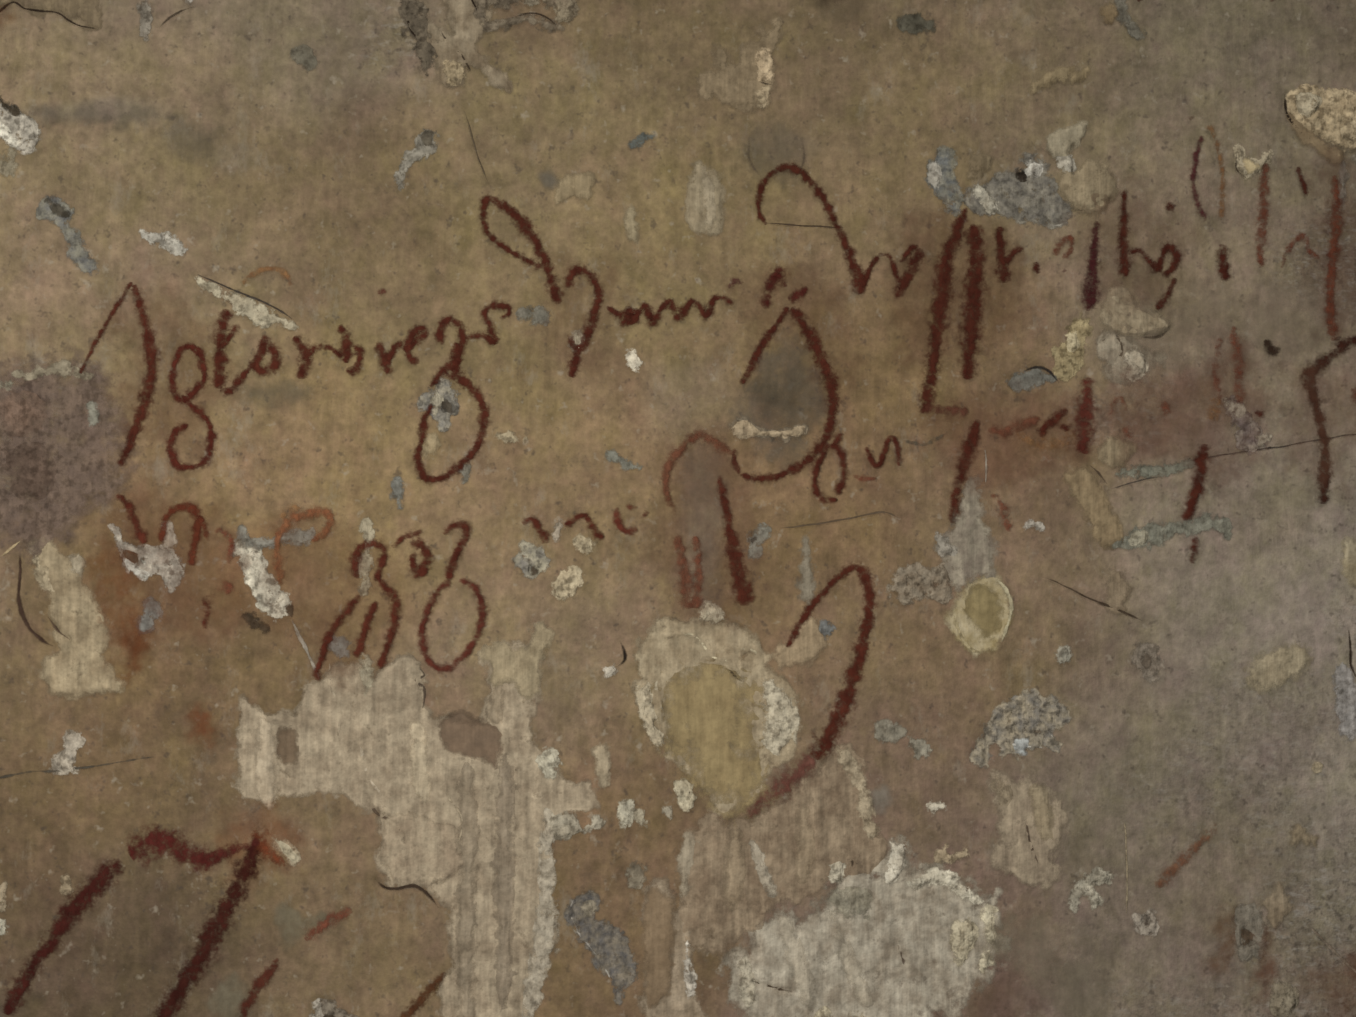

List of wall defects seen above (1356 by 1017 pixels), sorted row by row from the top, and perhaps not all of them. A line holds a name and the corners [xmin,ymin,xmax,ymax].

crack [0,2,91,28]
flaking render [398,0,579,93]
spalling [0,97,41,177]
spalling [925,121,1119,229]
spalling [1284,83,1356,203]
spalling [886,451,1014,656]
spalling [1056,646,1071,663]
flaking render [231,517,1011,1017]
spalling [969,688,1113,913]